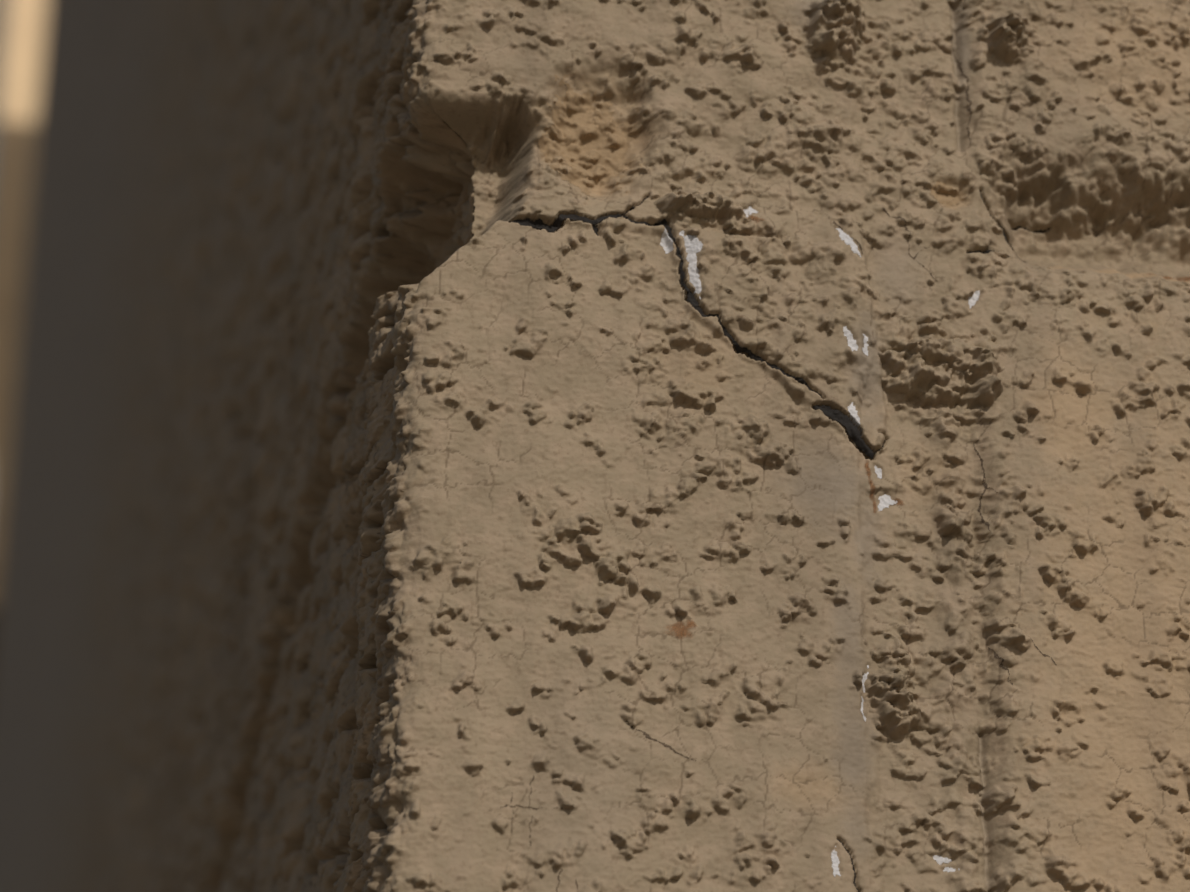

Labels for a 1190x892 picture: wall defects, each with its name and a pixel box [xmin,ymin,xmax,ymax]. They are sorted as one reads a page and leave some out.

peeling [660,228,703,300]
crack [882,207,936,280]
crack [510,197,887,459]
crack [838,840,860,892]